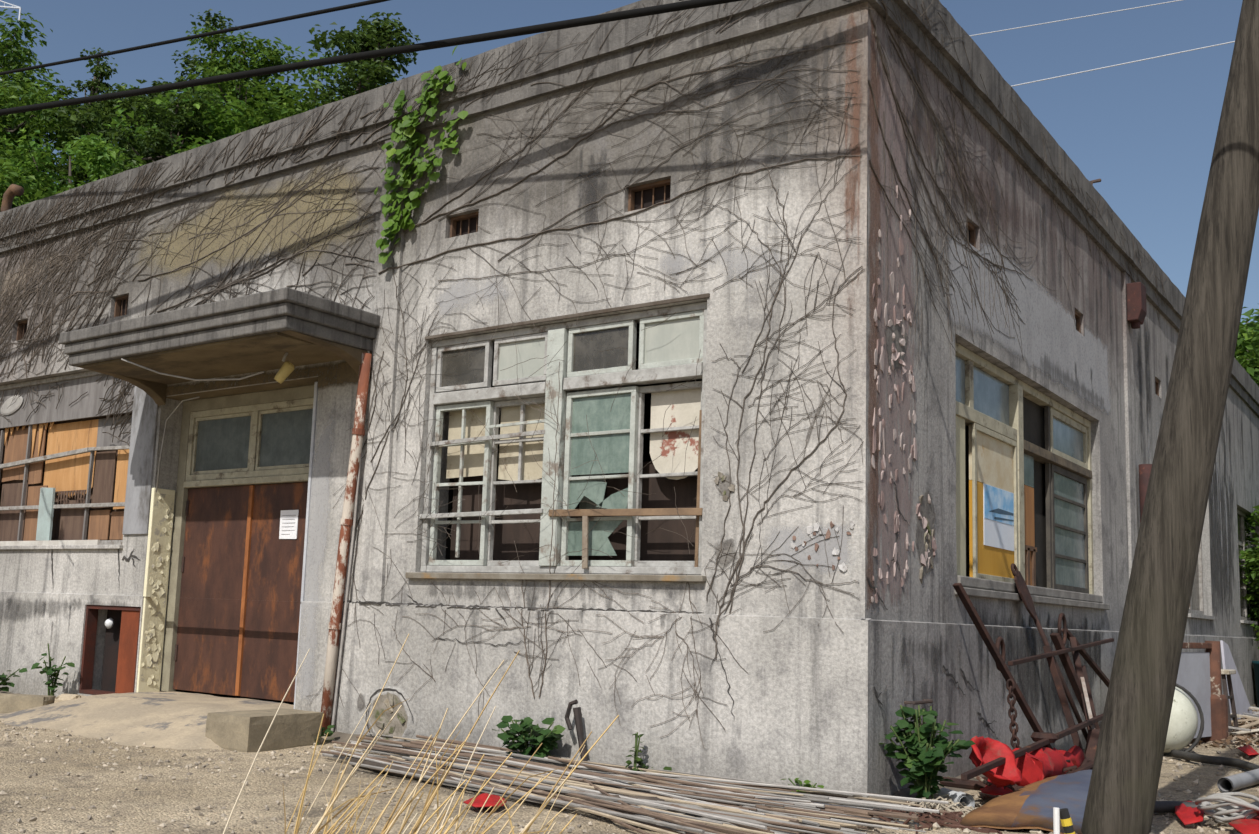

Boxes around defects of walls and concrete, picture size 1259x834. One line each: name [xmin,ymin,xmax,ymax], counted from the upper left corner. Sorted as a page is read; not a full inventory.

damp [727,57,809,114]
damp [584,173,598,229]
peeling [871,60,937,603]
damp [1138,320,1158,457]
damp [1209,404,1253,625]
crack [343,595,735,717]